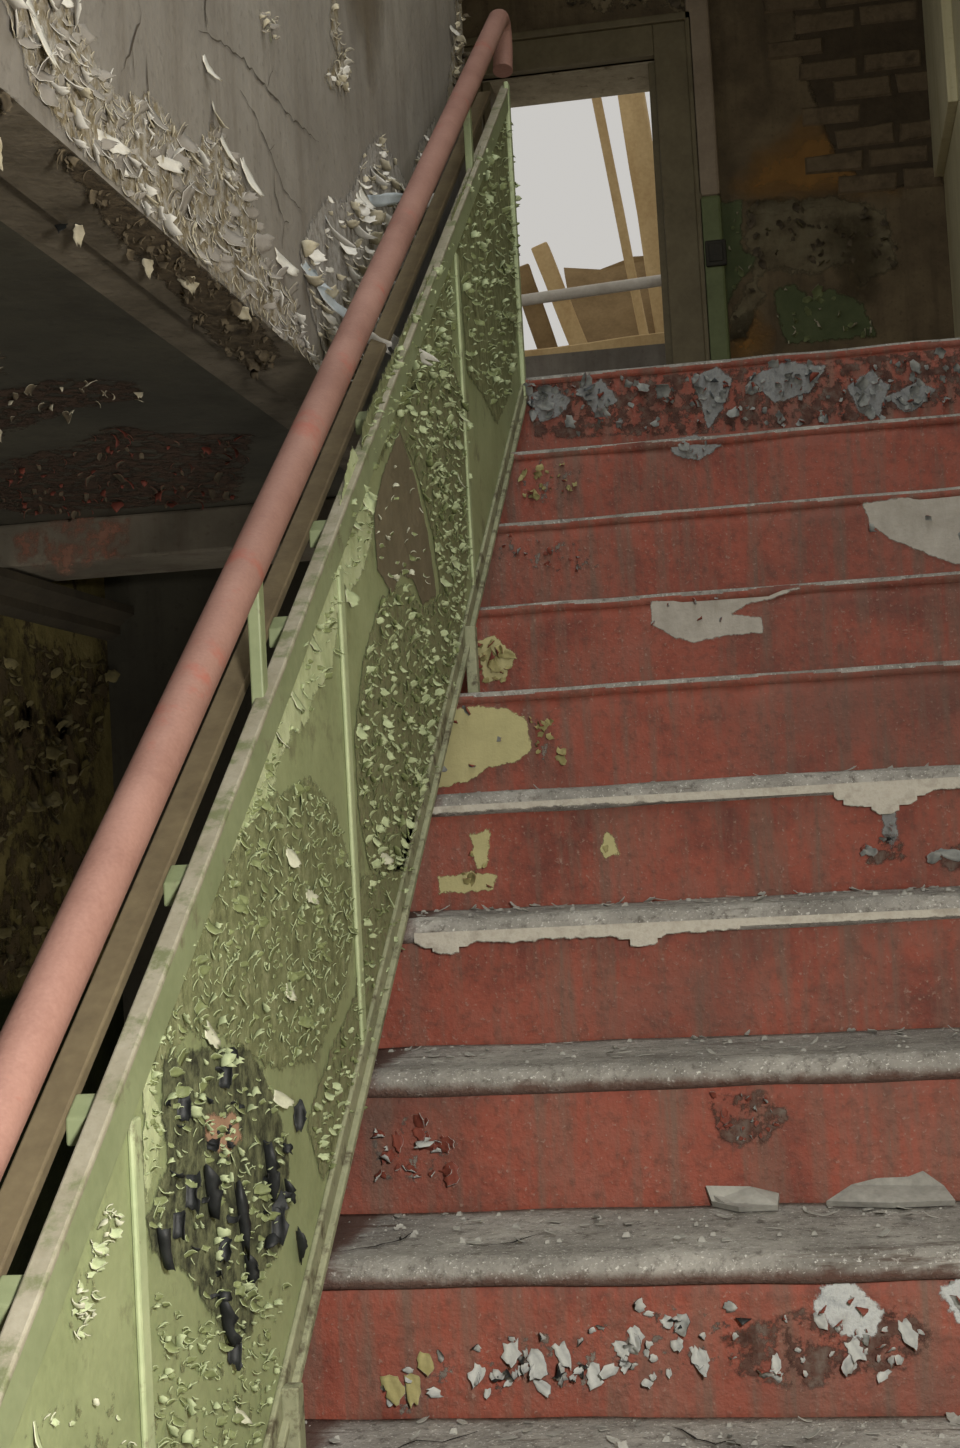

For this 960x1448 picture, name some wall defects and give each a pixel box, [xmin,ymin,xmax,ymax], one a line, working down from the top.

spalling [3,0,471,381]
spalling [0,379,144,443]
peeling [142,119,960,1448]
peeling [0,830,85,996]
peeling [70,1203,125,1340]
peeling [25,1394,137,1448]